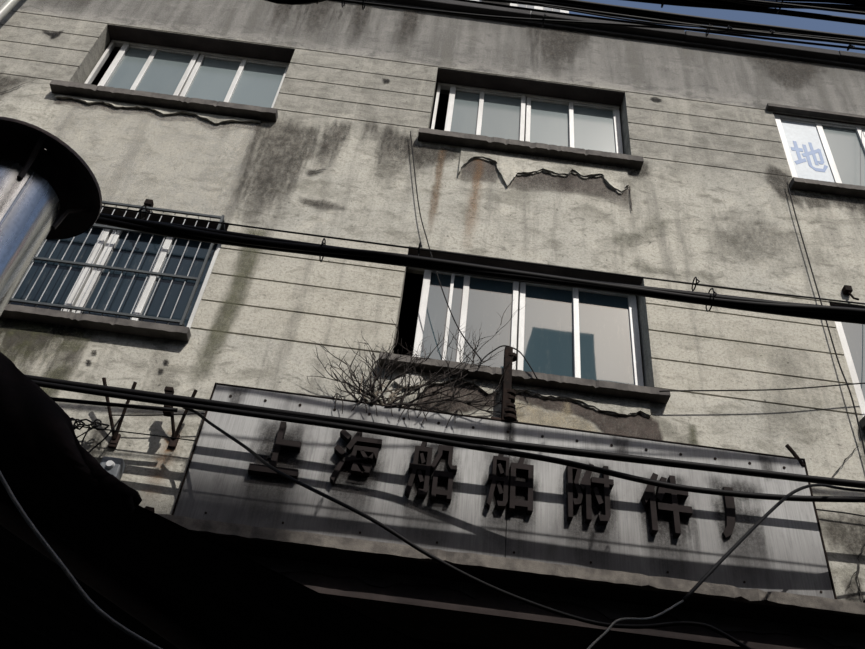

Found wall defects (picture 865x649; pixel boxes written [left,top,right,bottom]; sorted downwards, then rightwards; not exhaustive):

water stain [529,26,589,61]
peeling [55,95,261,130]
water stain [238,123,349,203]
water stain [366,125,411,161]
peeling [458,148,632,211]
water stain [768,167,865,214]
water stain [0,319,92,396]
peeling [394,372,500,413]
peeling [511,384,663,440]
crack [847,542,865,600]